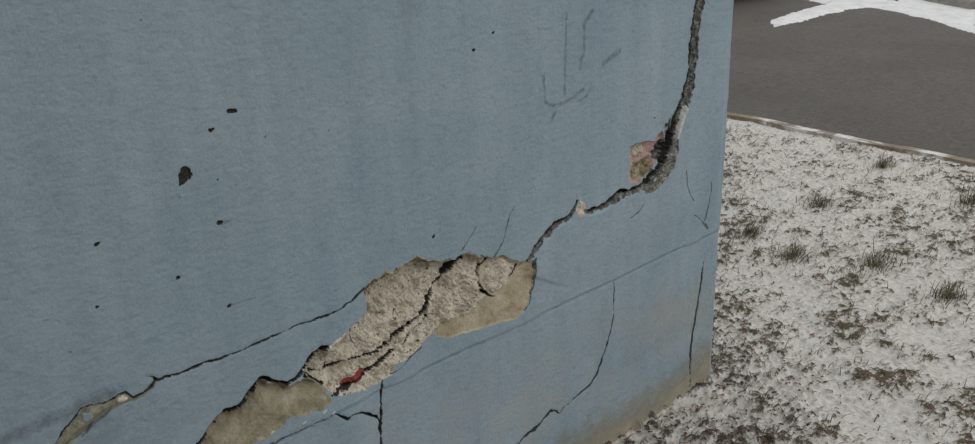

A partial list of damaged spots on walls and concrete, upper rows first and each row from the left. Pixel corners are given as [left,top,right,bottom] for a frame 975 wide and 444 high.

crack [526,0,712,262]
spalling [629,131,664,184]
crack [494,206,515,257]
peeling [55,377,157,444]
crack [148,288,364,382]
crack [196,345,383,444]
spalling [300,252,537,397]
crack [518,282,615,444]
crack [689,262,704,387]